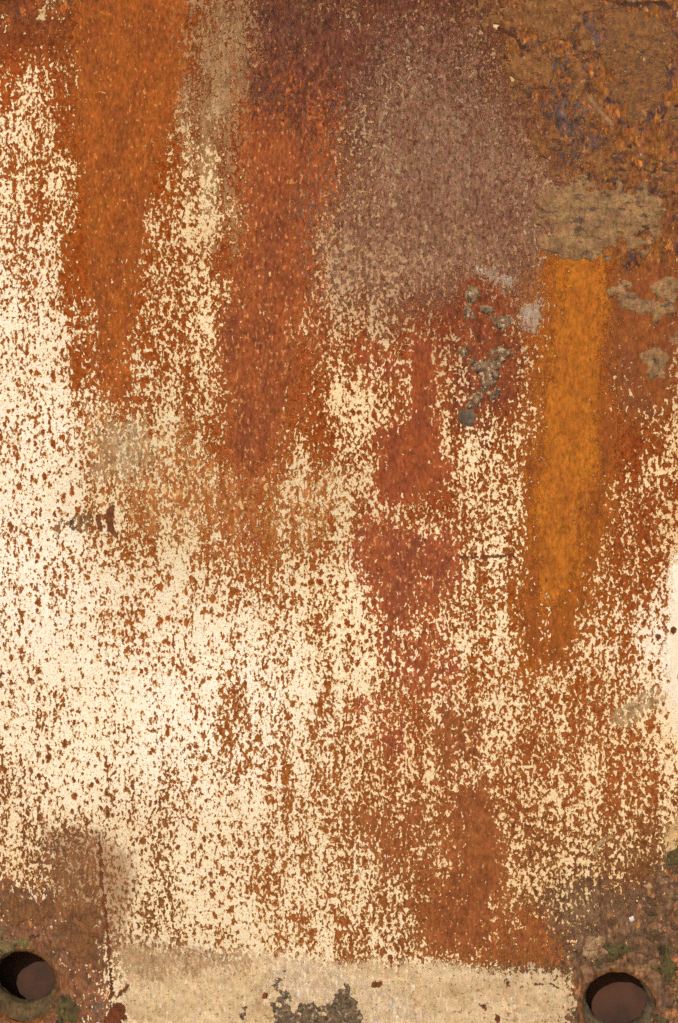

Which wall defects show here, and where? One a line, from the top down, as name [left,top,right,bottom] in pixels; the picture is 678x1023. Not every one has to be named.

spalling [96,504,118,539]
corrosion [338,685,428,780]
peeling [0,878,106,987]
corrosion [0,818,130,1023]
peeling [257,950,437,1023]